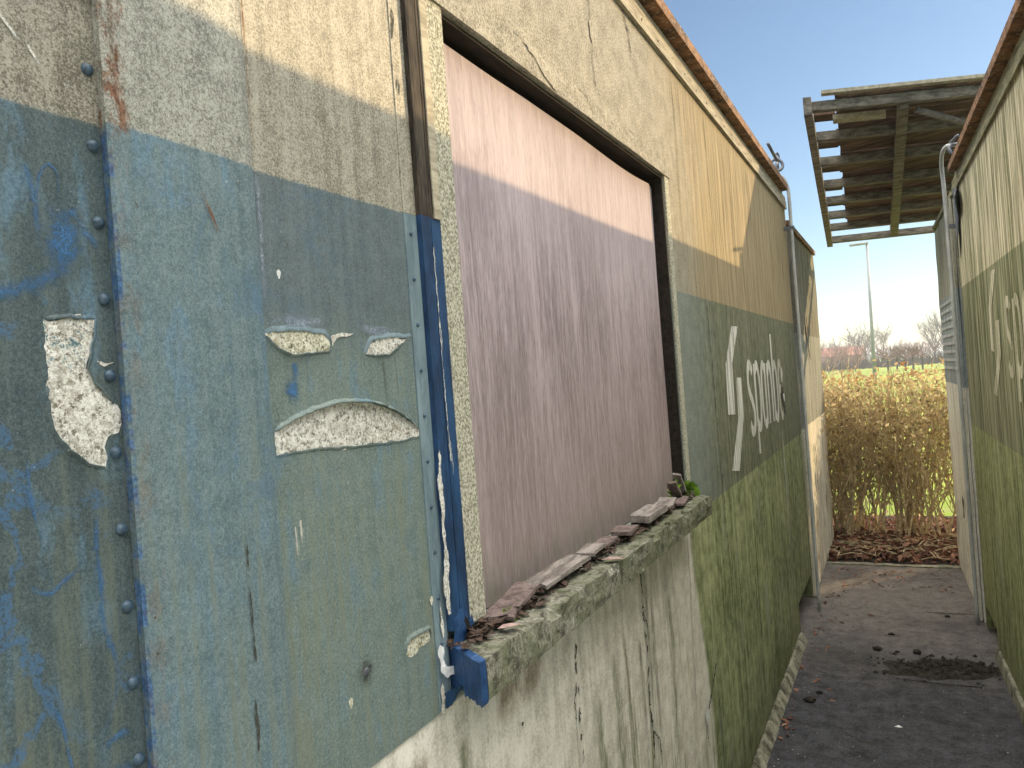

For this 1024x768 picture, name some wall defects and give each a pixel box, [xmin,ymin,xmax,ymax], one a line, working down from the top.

peeling [43,313,121,470]
peeling [265,316,353,358]
peeling [274,398,420,458]
peeling [364,327,411,358]
peeling [404,451,489,713]
crack [639,574,662,759]